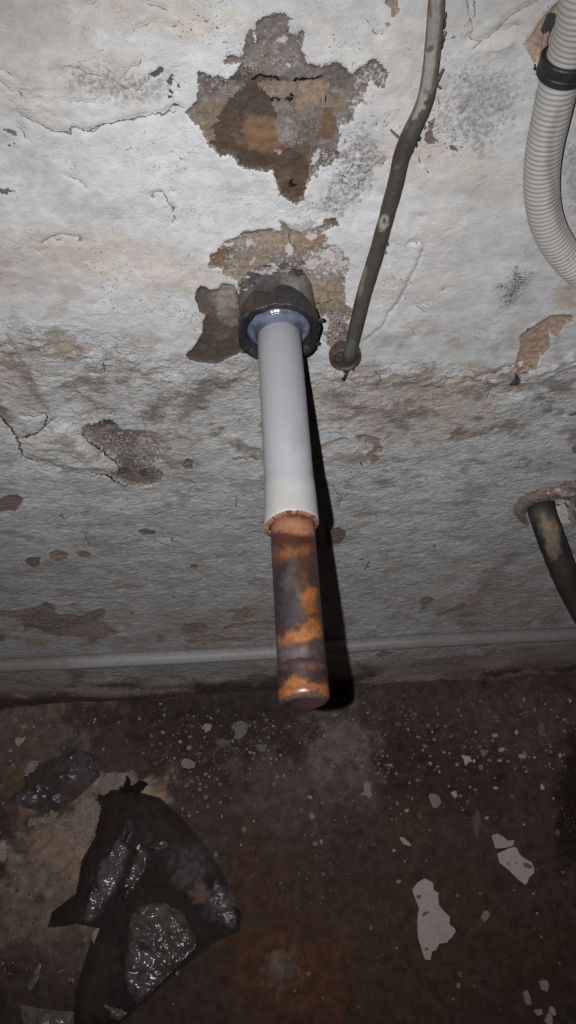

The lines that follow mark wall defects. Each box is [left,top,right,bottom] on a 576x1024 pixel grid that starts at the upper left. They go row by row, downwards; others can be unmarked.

peeling [523,1,558,76]
crack [0,59,184,140]
peeling [149,12,389,205]
peeling [186,217,354,364]
peeling [514,314,574,374]
crack [0,414,60,468]
flaking render [76,418,164,488]